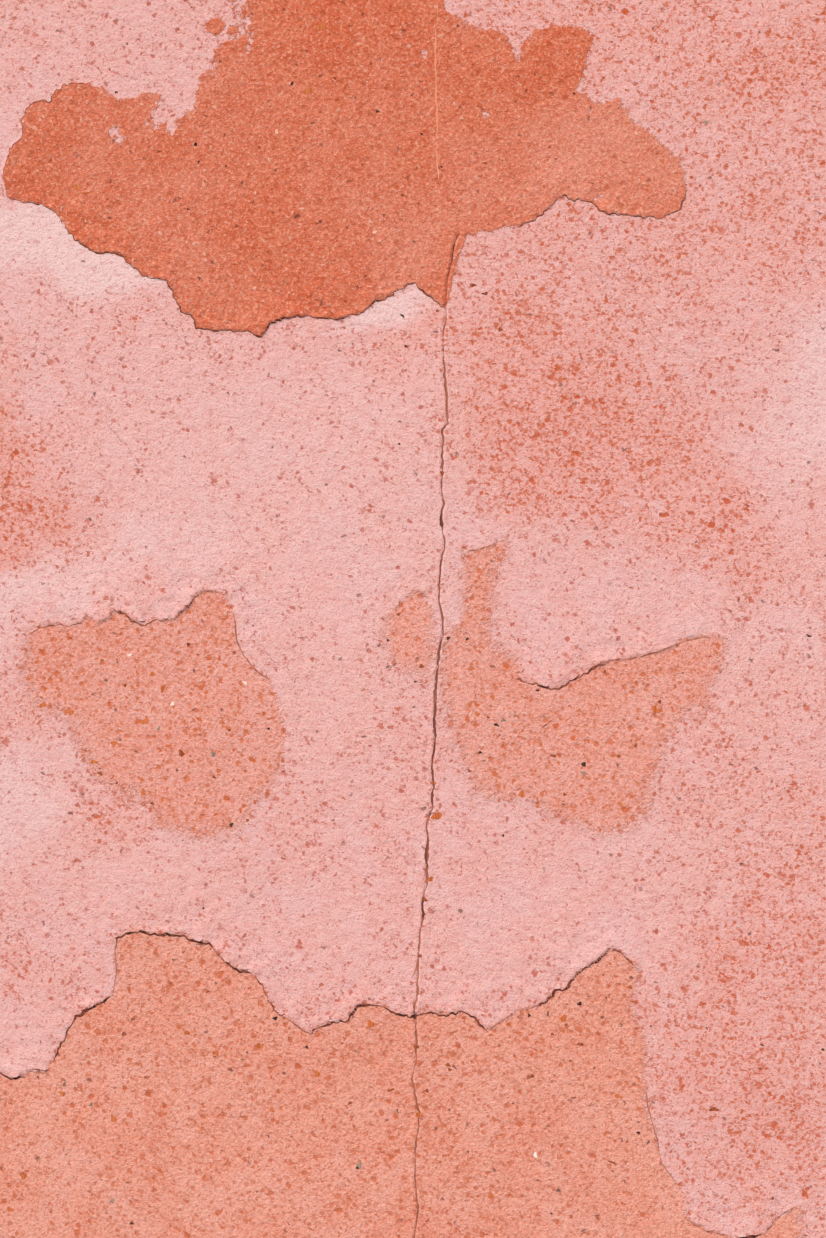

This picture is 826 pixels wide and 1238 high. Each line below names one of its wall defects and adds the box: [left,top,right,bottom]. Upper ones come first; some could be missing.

peeling [0,0,708,358]
peeling [1,571,305,857]
crack [0,233,633,1238]
peeling [364,518,748,854]
peeling [0,907,824,1238]